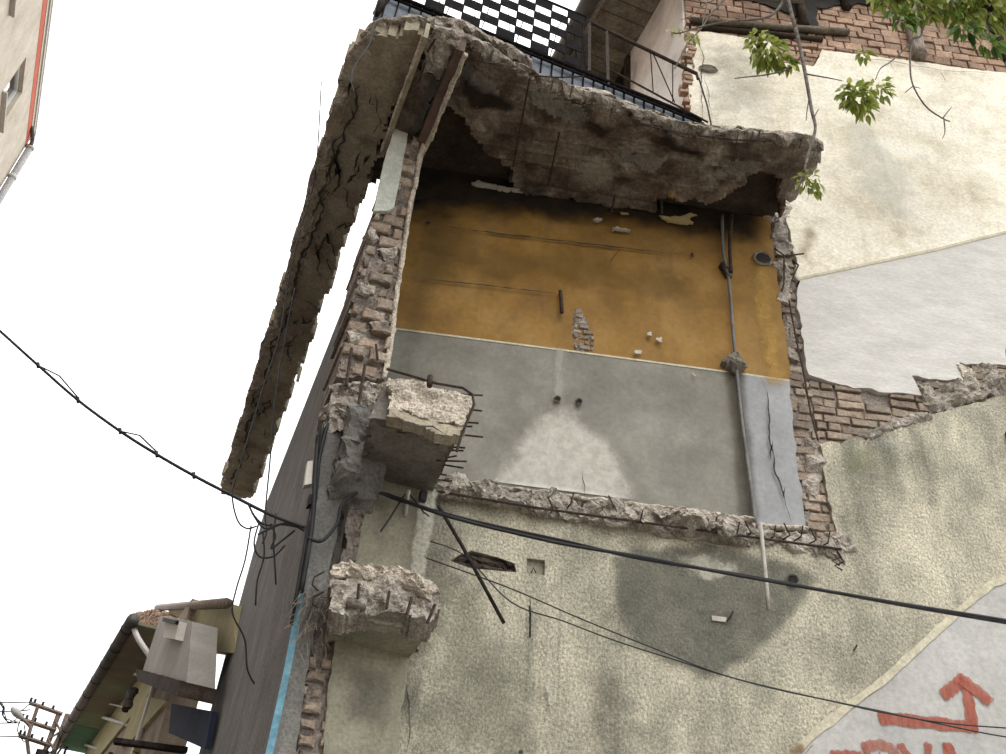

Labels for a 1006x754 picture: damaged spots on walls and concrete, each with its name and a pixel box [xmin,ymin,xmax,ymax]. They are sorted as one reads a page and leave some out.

spalling [512,75,584,167]
spalling [643,118,778,146]
peeling [471,180,523,194]
peeling [611,194,631,233]
peeling [659,212,697,225]
crack [230,81,382,485]
spalling [571,307,594,352]
spalling [735,202,857,571]
spalling [375,344,718,534]
crack [762,381,791,520]
leakage [619,550,811,674]